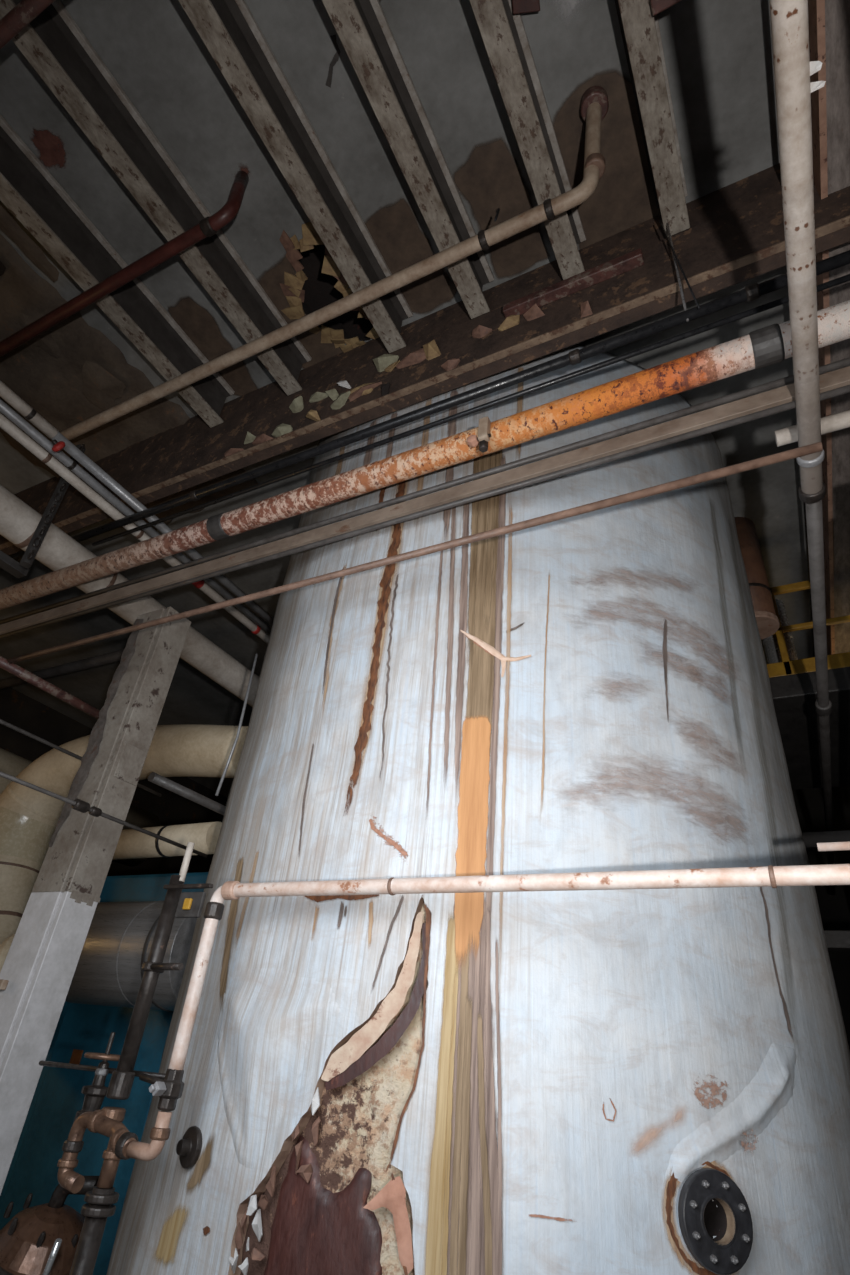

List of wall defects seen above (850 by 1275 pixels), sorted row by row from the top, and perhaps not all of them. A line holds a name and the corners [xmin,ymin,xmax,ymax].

peeling [0,205,190,478]
spalling [279,221,379,353]
peeling [224,340,460,457]
leakage [365,199,435,274]
leakage [400,268,457,314]
leakage [453,139,534,231]
leakage [553,70,661,249]
rust [426,492,512,876]
rust [305,877,396,944]
rust [264,892,503,1275]
peeling [229,1165,276,1275]
rust [663,1172,734,1275]